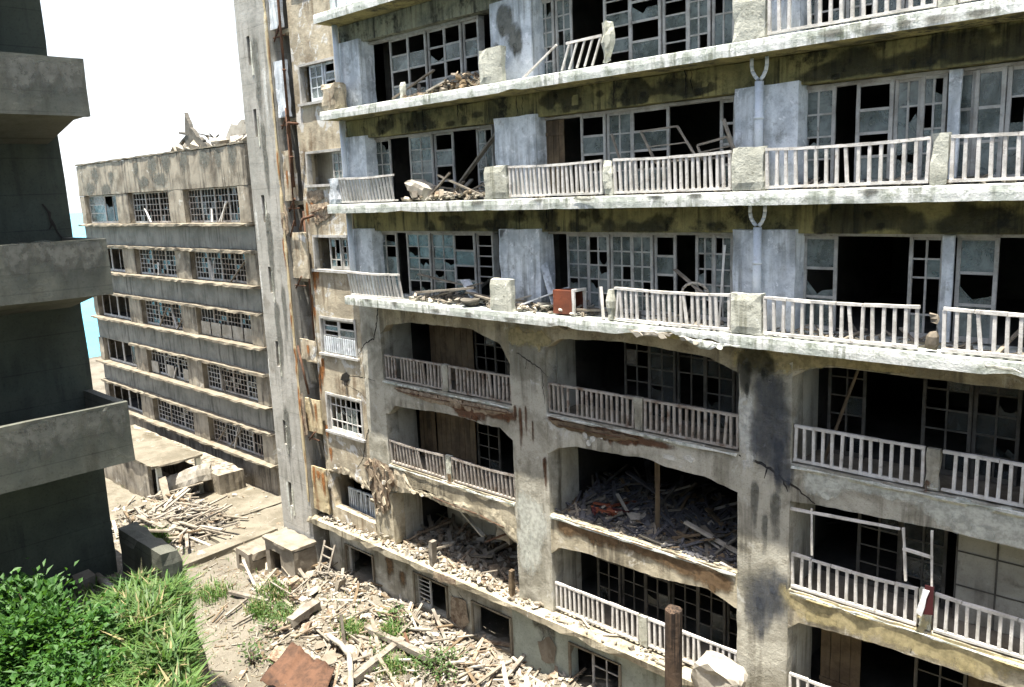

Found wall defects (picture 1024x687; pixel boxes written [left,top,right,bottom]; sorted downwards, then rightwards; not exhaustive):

damp [494,5,522,55]
damp [376,119,393,135]
damp [406,111,433,131]
damp [540,88,582,112]
damp [620,77,714,106]
crack [347,308,378,400]
corrosion [397,387,534,444]
damp [733,348,907,543]
corrosion [304,454,325,492]
crack [739,455,815,504]
damp [746,572,787,636]